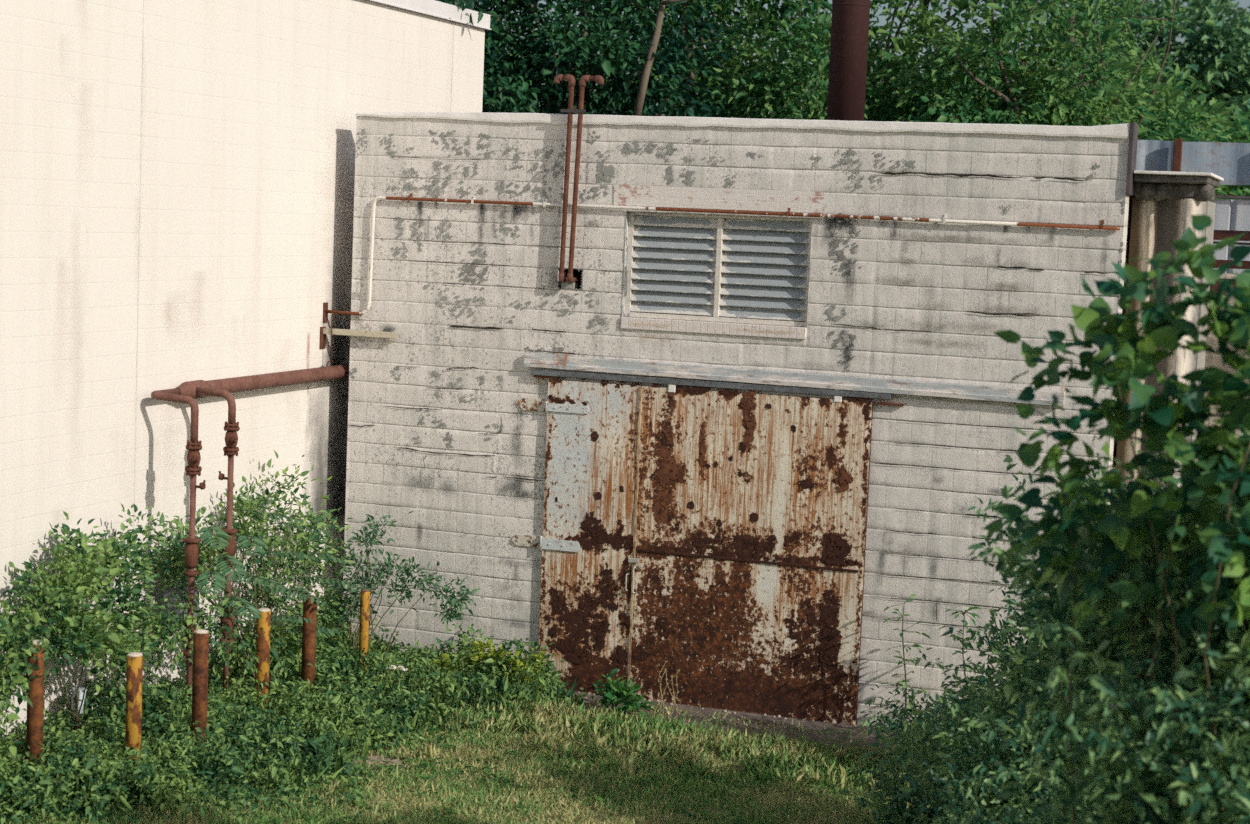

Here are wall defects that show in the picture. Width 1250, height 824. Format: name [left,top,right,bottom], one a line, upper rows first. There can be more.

peeling [356,128,566,202]
peeling [579,131,735,203]
damp [825,218,847,239]
peeling [424,219,520,323]
spalling [505,236,628,336]
damp [328,337,343,366]
damp [315,457,343,525]
corrosion [577,492,633,551]
corrosion [601,380,771,528]
corrosion [655,512,802,562]
corrosion [545,569,673,668]
corrosion [780,590,848,686]